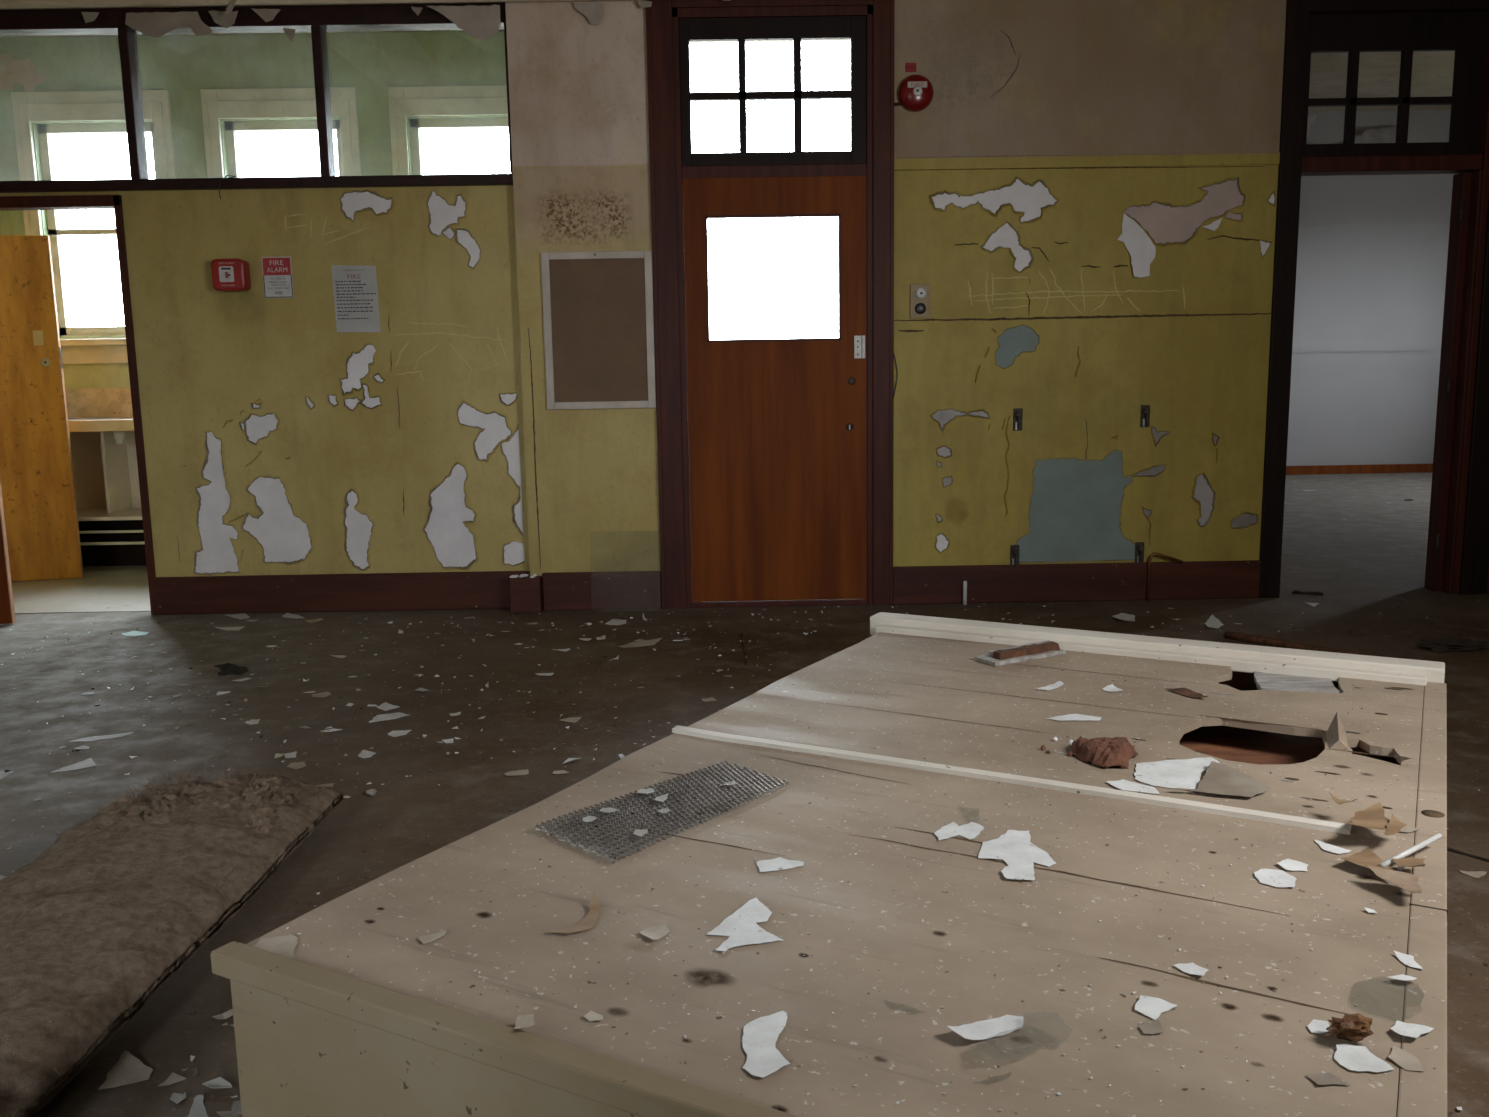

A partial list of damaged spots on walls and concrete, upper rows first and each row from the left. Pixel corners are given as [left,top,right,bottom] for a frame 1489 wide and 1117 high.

peeling [125,0,296,43]
peeling [338,189,394,223]
peeling [426,189,482,270]
peeling [928,176,1060,273]
peeling [1117,176,1246,278]
peeling [305,343,386,411]
peeling [994,324,1040,370]
peeling [239,402,281,446]
peeling [193,430,314,576]
peeling [343,488,376,571]
peeling [422,392,525,570]
peeling [1014,425,1171,564]